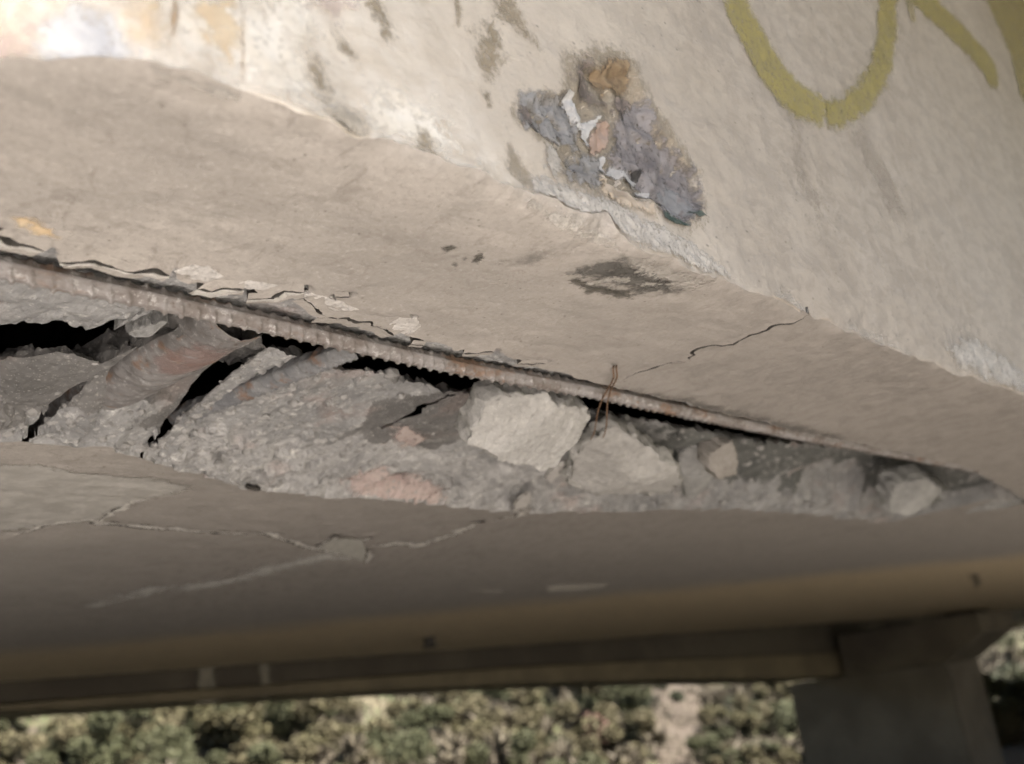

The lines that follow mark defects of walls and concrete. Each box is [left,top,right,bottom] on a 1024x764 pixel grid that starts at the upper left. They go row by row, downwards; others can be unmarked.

peeling [561,90,602,147]
crack [617,307,814,381]
spalling [0,247,1024,531]
rust [394,426,425,447]
rust [342,466,447,505]
crack [0,501,534,564]